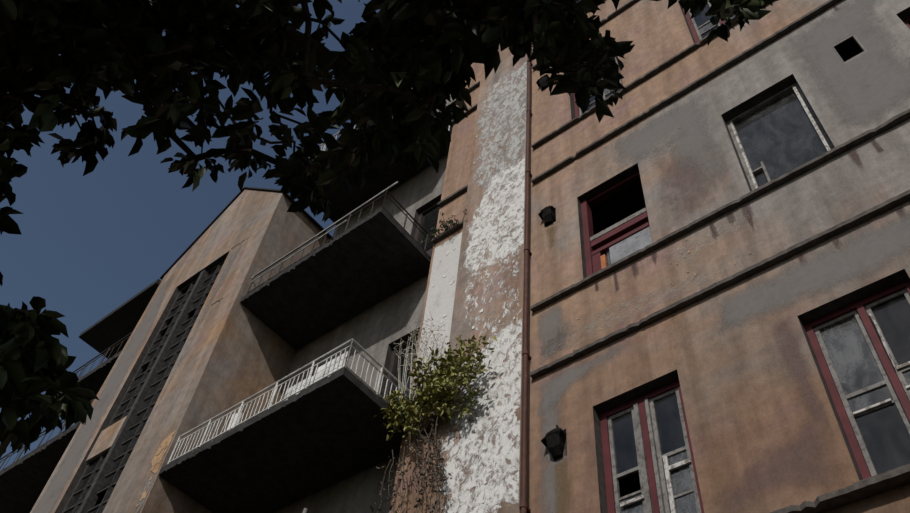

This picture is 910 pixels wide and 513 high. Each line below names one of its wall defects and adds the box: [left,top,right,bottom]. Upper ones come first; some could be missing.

spalling [135,430,176,513]
peeling [412,62,527,513]